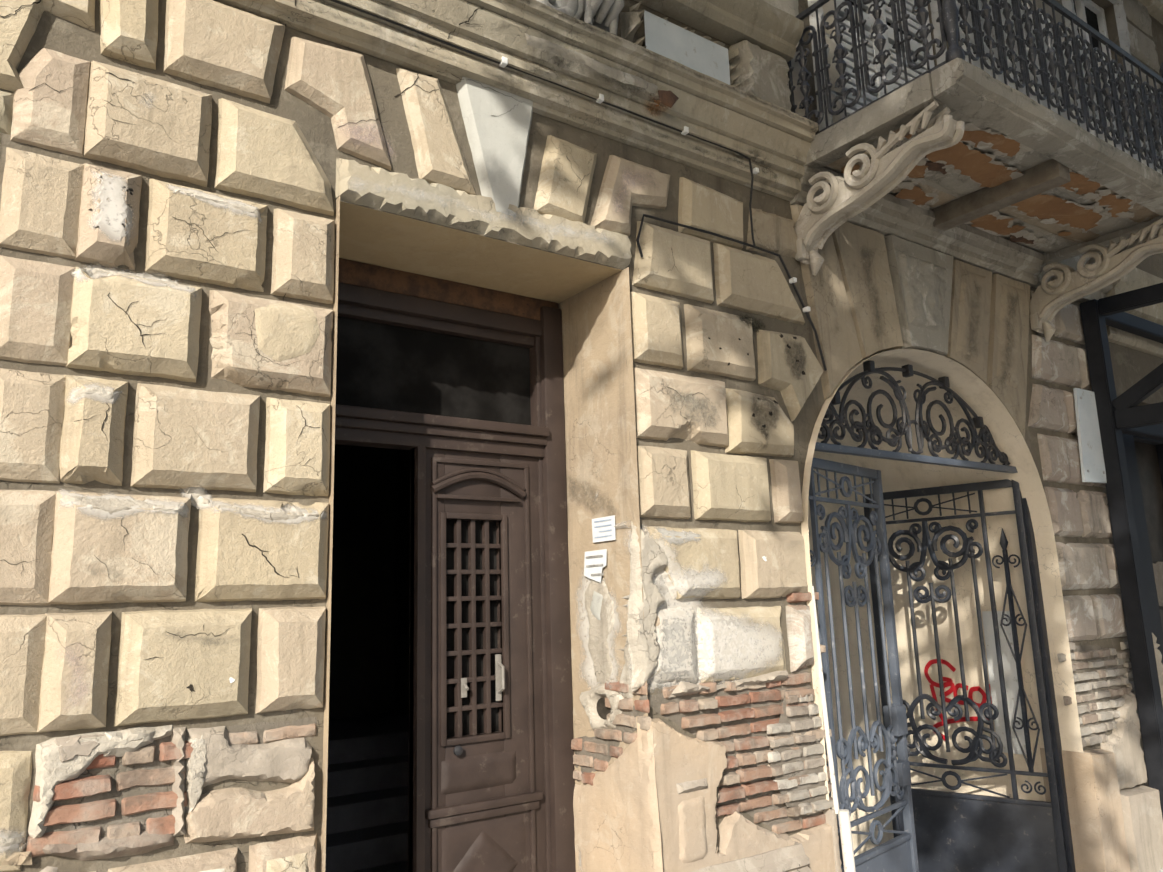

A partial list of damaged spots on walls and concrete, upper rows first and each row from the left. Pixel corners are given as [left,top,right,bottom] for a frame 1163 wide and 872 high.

peeling [894,122,1033,210]
peeling [964,169,1136,245]
crack [107,292,167,348]
crack [242,534,299,578]
peeling [571,521,834,834]
flaking render [1057,639,1142,748]
spalling [0,717,317,872]